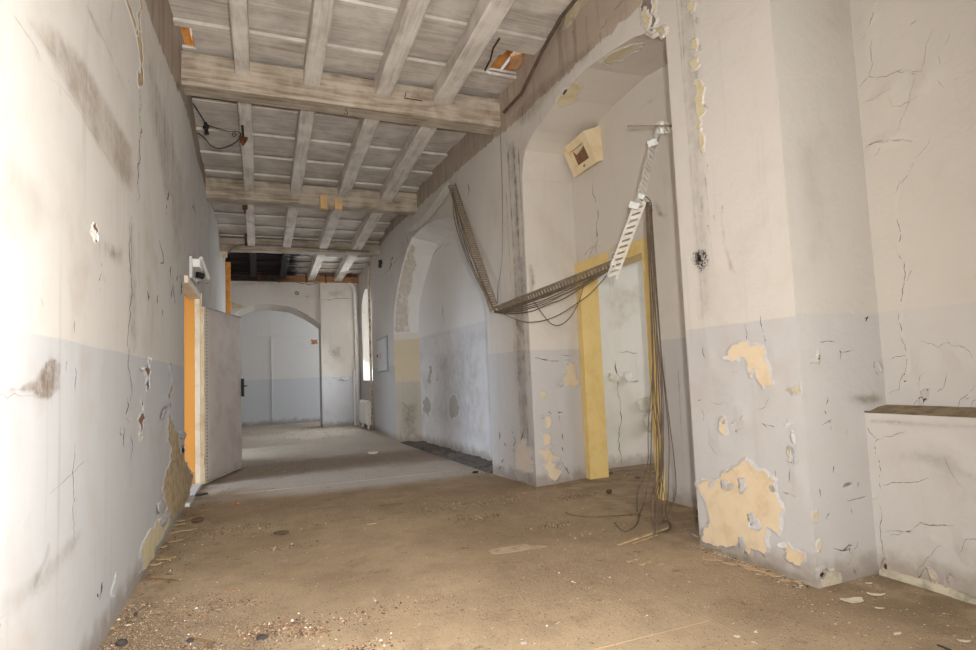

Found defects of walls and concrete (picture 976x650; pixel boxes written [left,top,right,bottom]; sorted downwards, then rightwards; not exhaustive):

spalling [596,0,669,66]
peeling [685,0,708,153]
crack [120,65,148,454]
crack [159,241,182,298]
crack [863,18,976,407]
peeling [722,339,804,397]
peeling [137,357,194,576]
peeling [513,414,575,484]
peeling [694,456,846,588]
crack [775,400,976,579]